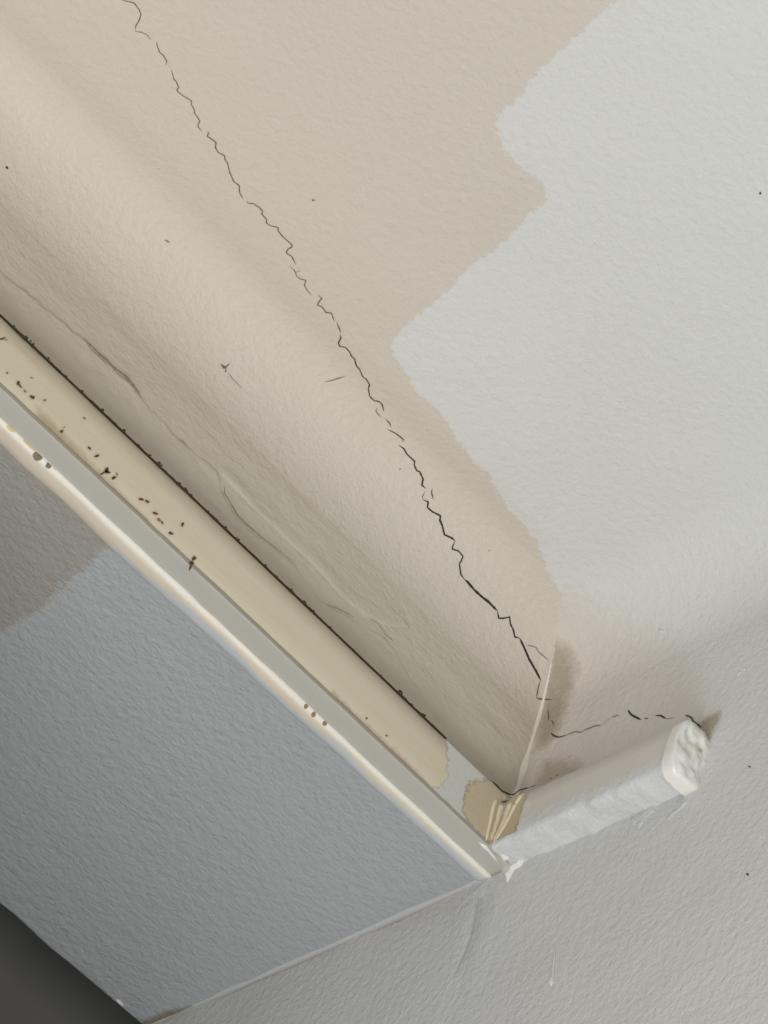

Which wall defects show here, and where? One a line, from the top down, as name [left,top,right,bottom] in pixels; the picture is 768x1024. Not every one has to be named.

crack [123,0,701,738]